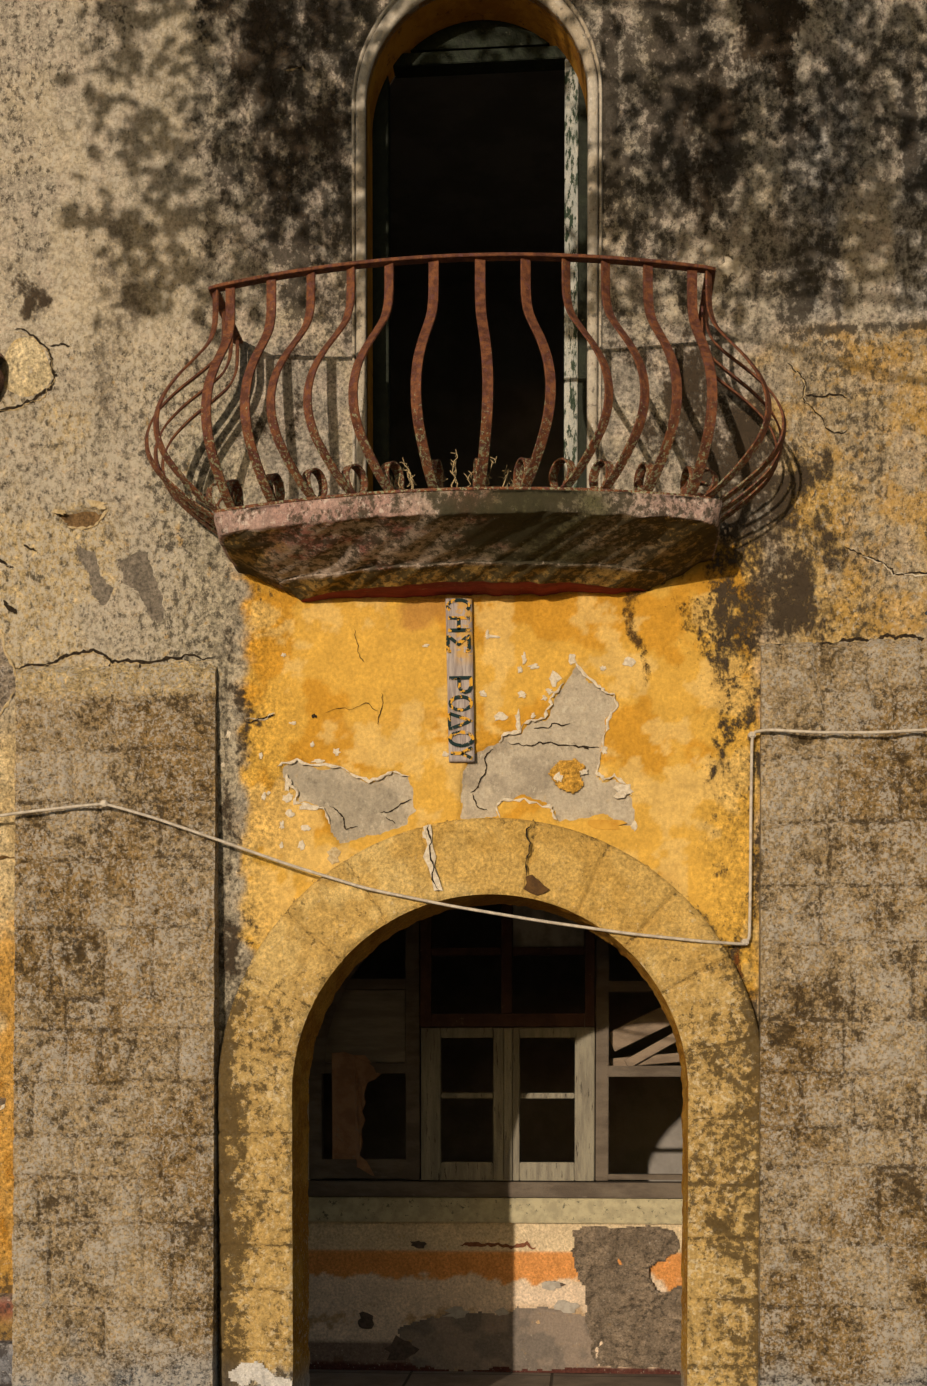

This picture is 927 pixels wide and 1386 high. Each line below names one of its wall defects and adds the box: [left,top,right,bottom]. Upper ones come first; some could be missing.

leakage [194,0,356,247]
leakage [667,0,814,239]
leakage [4,253,52,321]
leakage [236,390,303,451]
leakage [617,323,849,785]
crack [15,648,213,671]
peeling [261,741,416,865]
spalling [524,824,550,895]
peeling [460,652,637,831]
leakage [740,795,760,917]
spalling [384,1225,682,1373]
peeling [228,1361,292,1386]